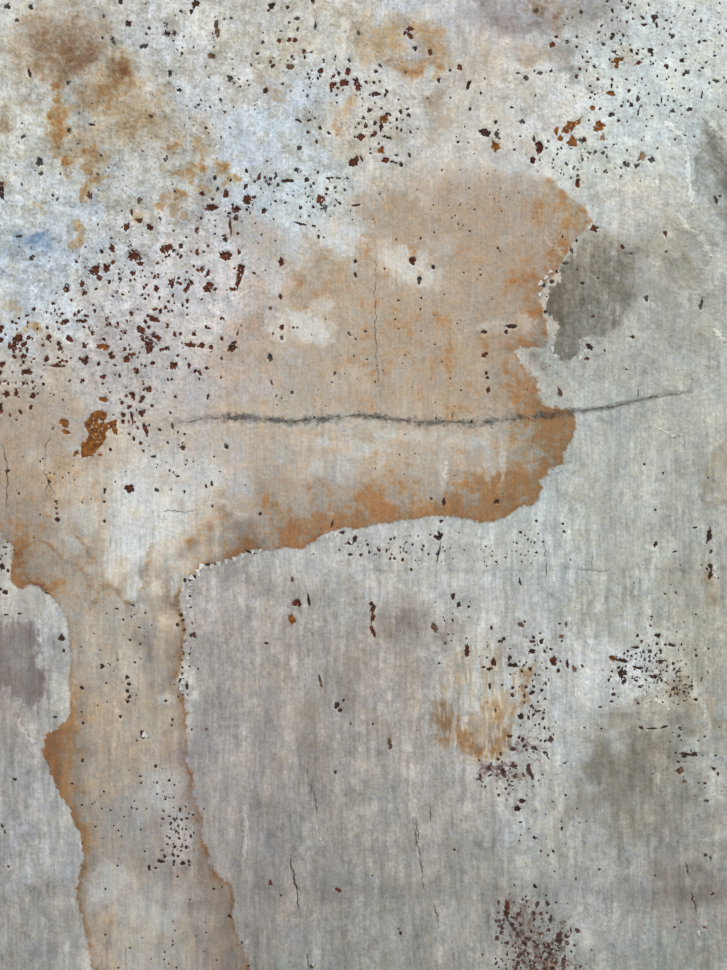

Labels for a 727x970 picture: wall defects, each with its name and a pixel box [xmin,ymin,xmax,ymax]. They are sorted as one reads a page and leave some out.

corrosion [0,0,244,226]
corrosion [260,80,295,109]
corrosion [327,0,576,143]
corrosion [610,37,648,68]
water stain [525,105,727,378]
crack [173,260,695,430]
corrosion [0,152,594,970]